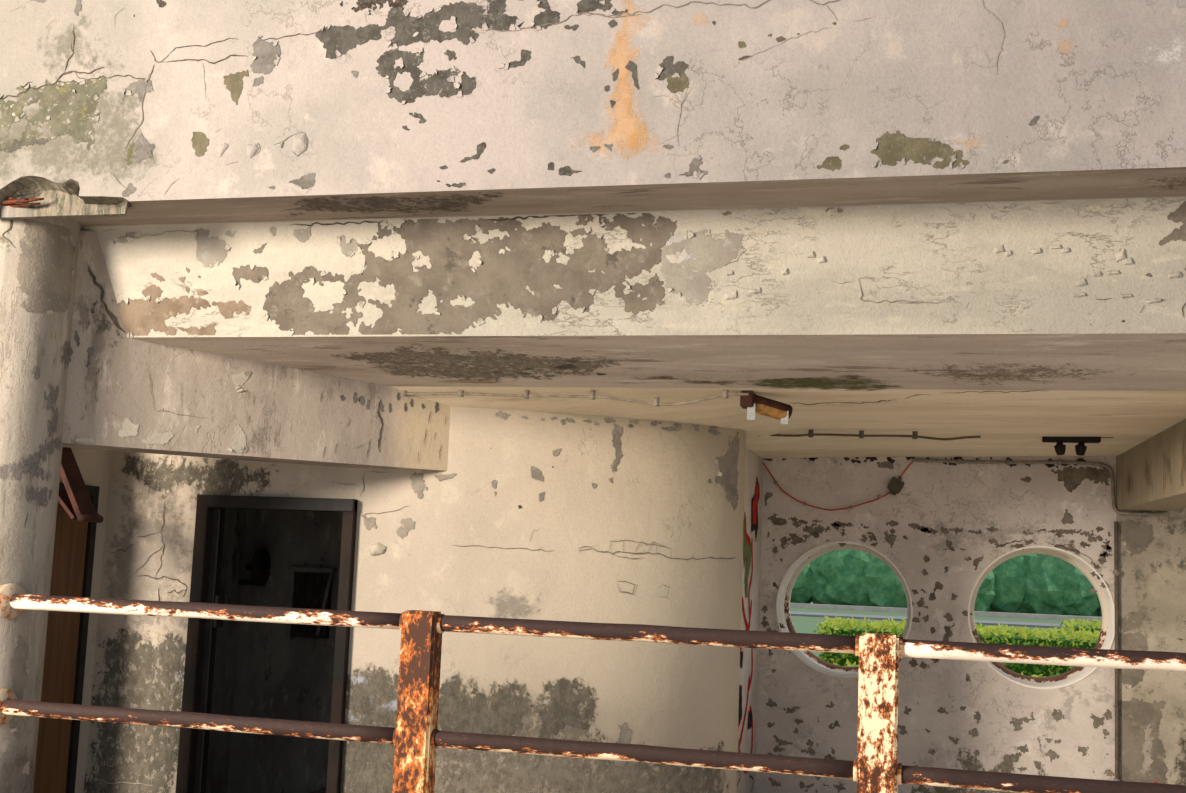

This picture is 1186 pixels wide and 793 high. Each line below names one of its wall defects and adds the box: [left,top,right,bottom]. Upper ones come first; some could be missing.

crack [1,18,318,190]
peeling [315,0,628,130]
corrosion [590,1,656,153]
crack [88,266,125,356]
peeling [117,211,745,337]
damp [108,455,278,601]
peeling [765,492,1154,593]
damp [83,721,180,793]
damp [91,615,188,711]
damp [344,664,399,728]
damp [437,673,619,743]
peeling [1090,669,1168,784]